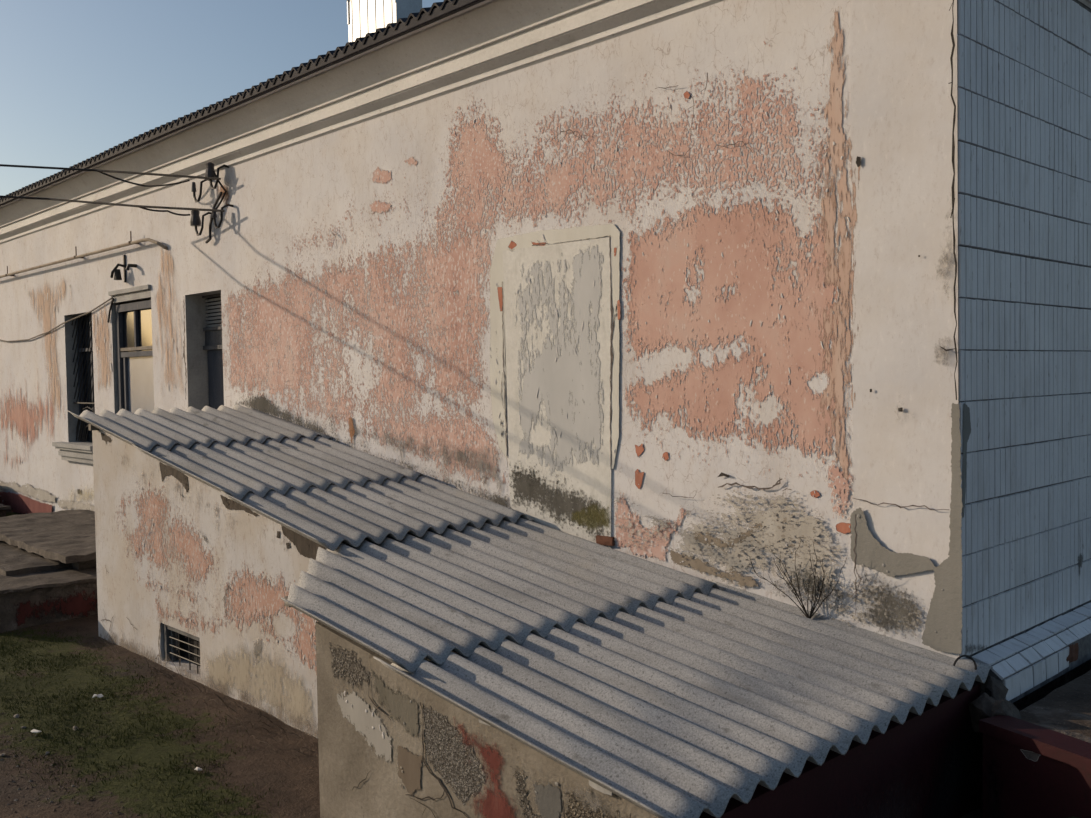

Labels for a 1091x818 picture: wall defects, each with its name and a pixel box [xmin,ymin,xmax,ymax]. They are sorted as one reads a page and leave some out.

crack [940,0,958,400]
peeling [0,282,70,467]
damp [234,393,362,447]
peeling [220,10,925,639]
damp [431,439,611,540]
crack [662,479,792,503]
peeling [115,462,317,674]
damp [775,572,845,610]
damp [854,574,921,638]
flaking render [329,642,487,805]
crack [405,702,469,818]
flaking render [510,765,540,818]